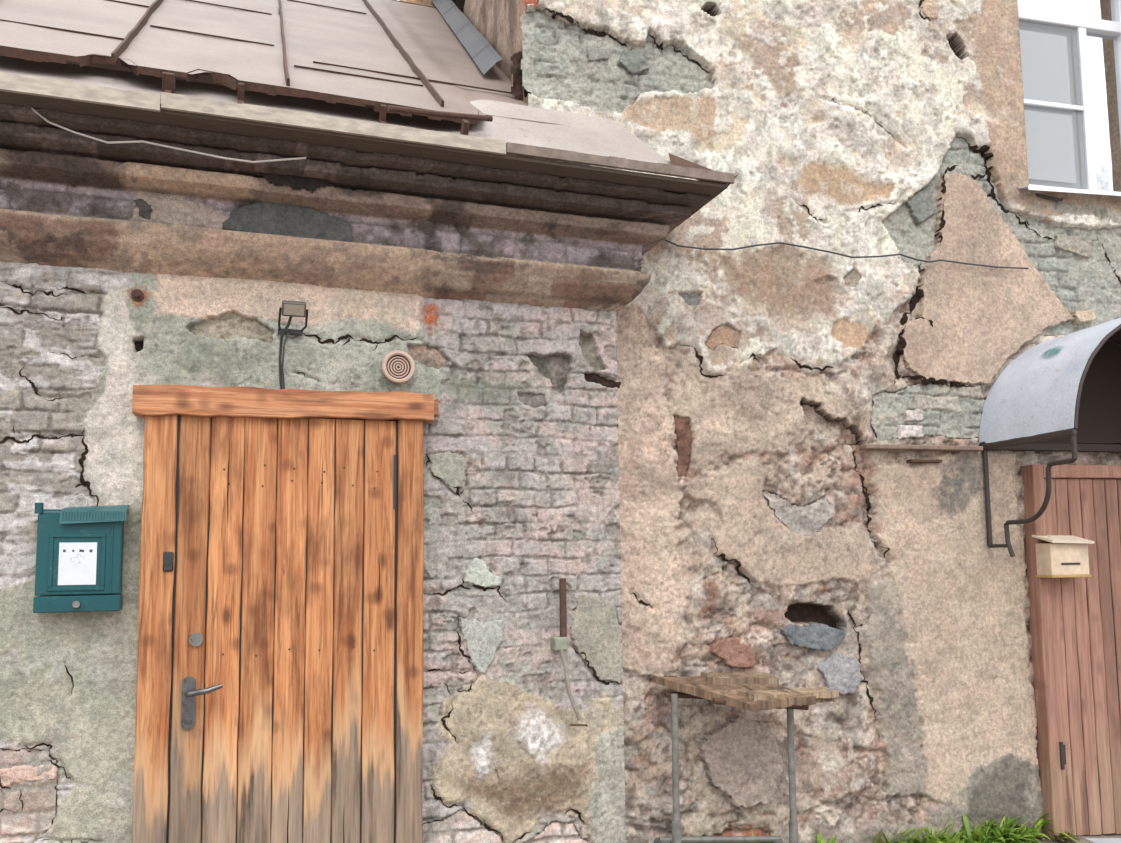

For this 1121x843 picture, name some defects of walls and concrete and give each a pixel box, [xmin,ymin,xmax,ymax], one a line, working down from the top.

spalling [511,0,713,114]
crack [0,281,104,320]
peeling [871,137,1121,440]
crack [290,333,425,350]
spalling [579,332,621,388]
crack [0,426,99,506]
spalling [674,415,693,477]
peeling [464,558,502,588]
crack [22,743,71,780]
crack [0,777,23,812]
spalling [0,749,58,843]
spalling [423,809,504,843]